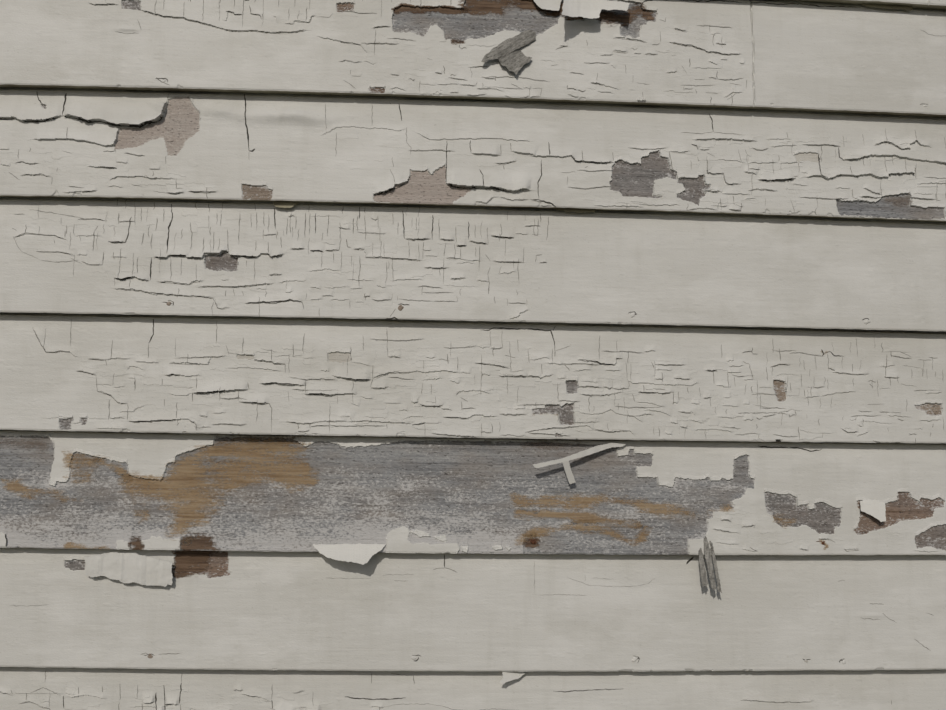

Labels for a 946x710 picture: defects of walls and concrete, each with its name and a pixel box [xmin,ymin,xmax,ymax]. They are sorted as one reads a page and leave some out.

peeling [861,3,913,11]
peeling [75,0,753,107]
crack [244,94,255,152]
peeling [0,89,946,593]
crack [484,327,555,346]
crack [349,655,457,710]